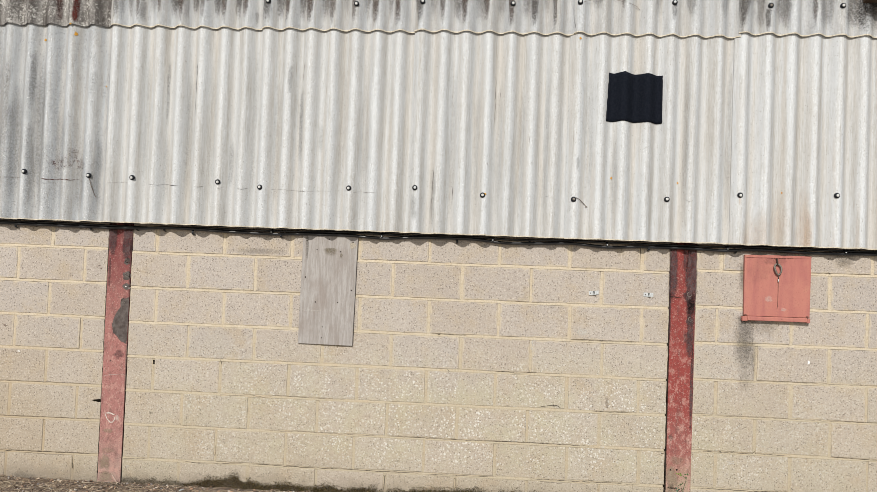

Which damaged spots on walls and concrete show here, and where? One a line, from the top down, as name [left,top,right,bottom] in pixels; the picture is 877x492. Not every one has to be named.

corrosion [57,0,80,20]
peeling [109,223,133,343]